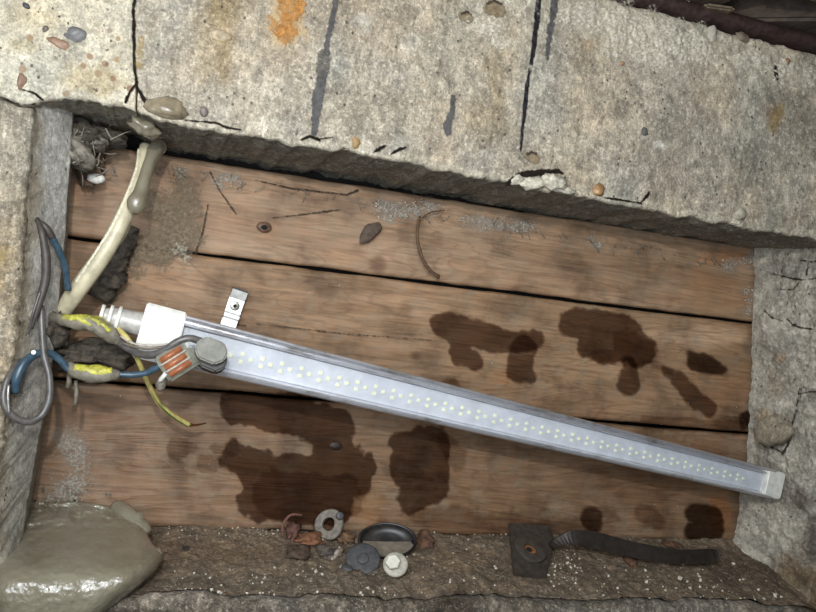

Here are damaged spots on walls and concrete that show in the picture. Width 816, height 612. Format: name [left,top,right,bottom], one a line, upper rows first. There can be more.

crack [124,0,147,104]
corrosion [268,0,308,45]
crack [0,88,44,105]
crack [773,260,816,291]
leakage [430,313,543,382]
leakage [559,308,655,395]
leakage [663,351,727,417]
crack [764,310,812,330]
crack [770,388,816,455]
leakage [219,391,376,525]
leakage [389,426,449,514]